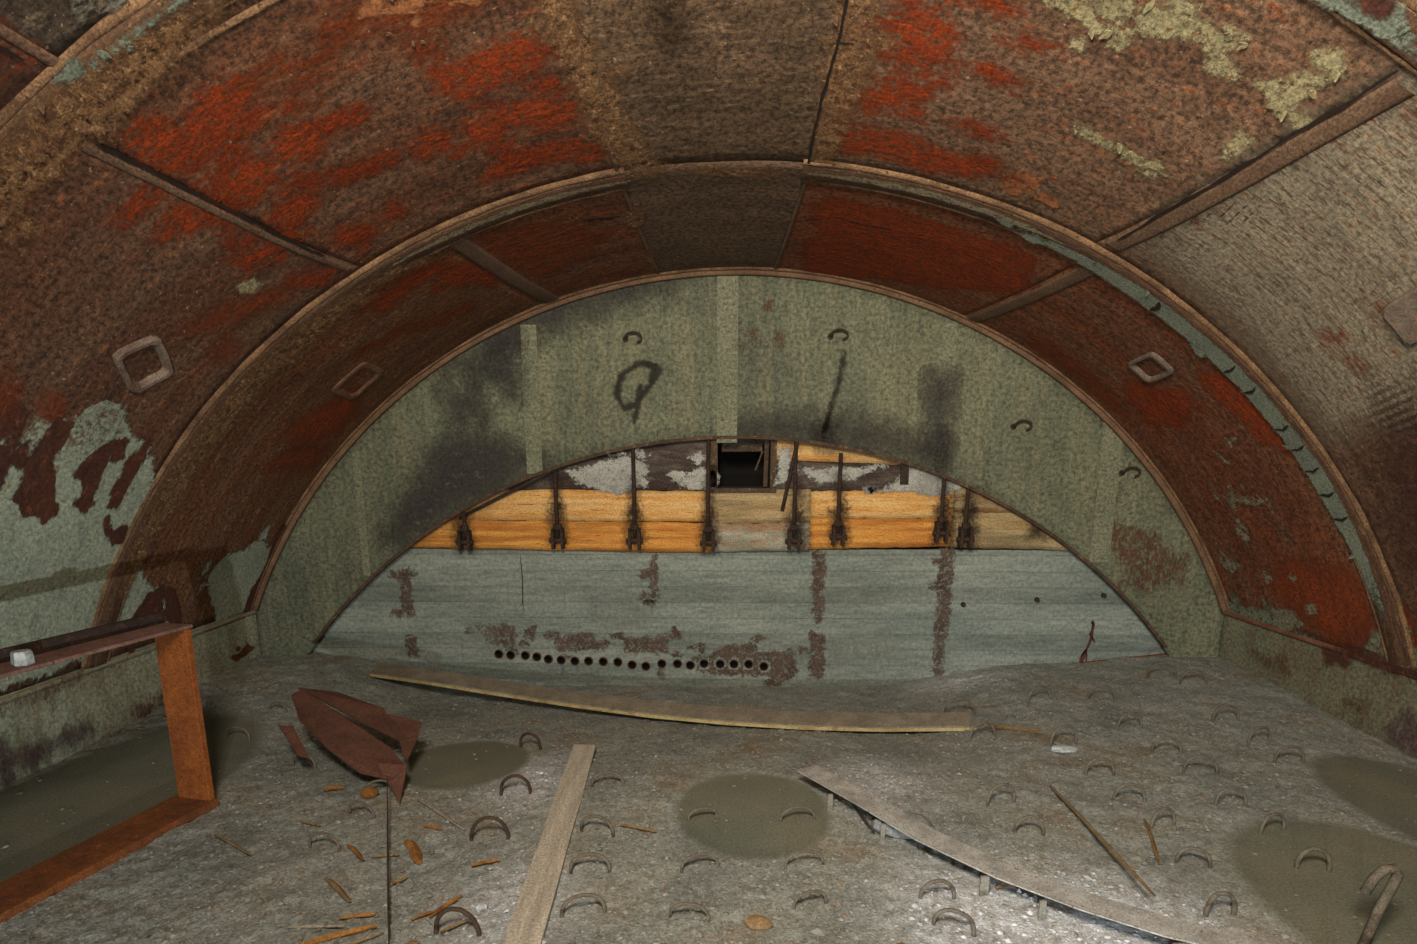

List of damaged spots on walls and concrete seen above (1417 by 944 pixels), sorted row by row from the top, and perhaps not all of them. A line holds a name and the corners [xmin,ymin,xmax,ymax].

corrosion [106,28,608,294]
peeling [392,0,782,266]
crack [807,0,854,166]
corrosion [826,0,1062,183]
peeling [806,0,1417,613]
peeling [0,657,84,691]
peeling [0,400,156,649]
peeling [119,566,169,623]
leakage [385,283,668,541]
peeling [773,445,962,499]
corrosion [1111,524,1190,592]
corrosion [1197,371,1296,458]